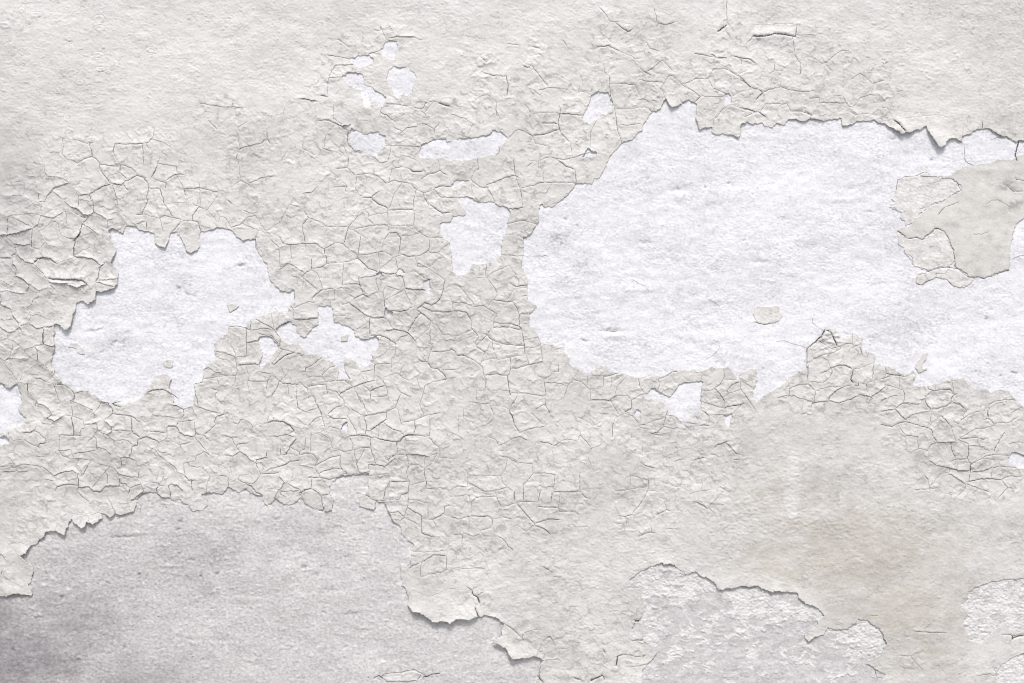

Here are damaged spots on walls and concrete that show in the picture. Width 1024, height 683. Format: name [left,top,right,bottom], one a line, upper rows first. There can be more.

peeling [48,221,379,408]
crack [0,4,906,616]
peeling [419,130,507,161]
peeling [440,180,511,275]
peeling [522,78,1024,423]
crack [890,121,1024,288]
peeling [0,384,26,445]
crack [756,319,1023,496]
peeling [9,473,548,683]
crack [504,587,646,682]
peeling [629,563,887,683]
peeling [961,578,1024,644]